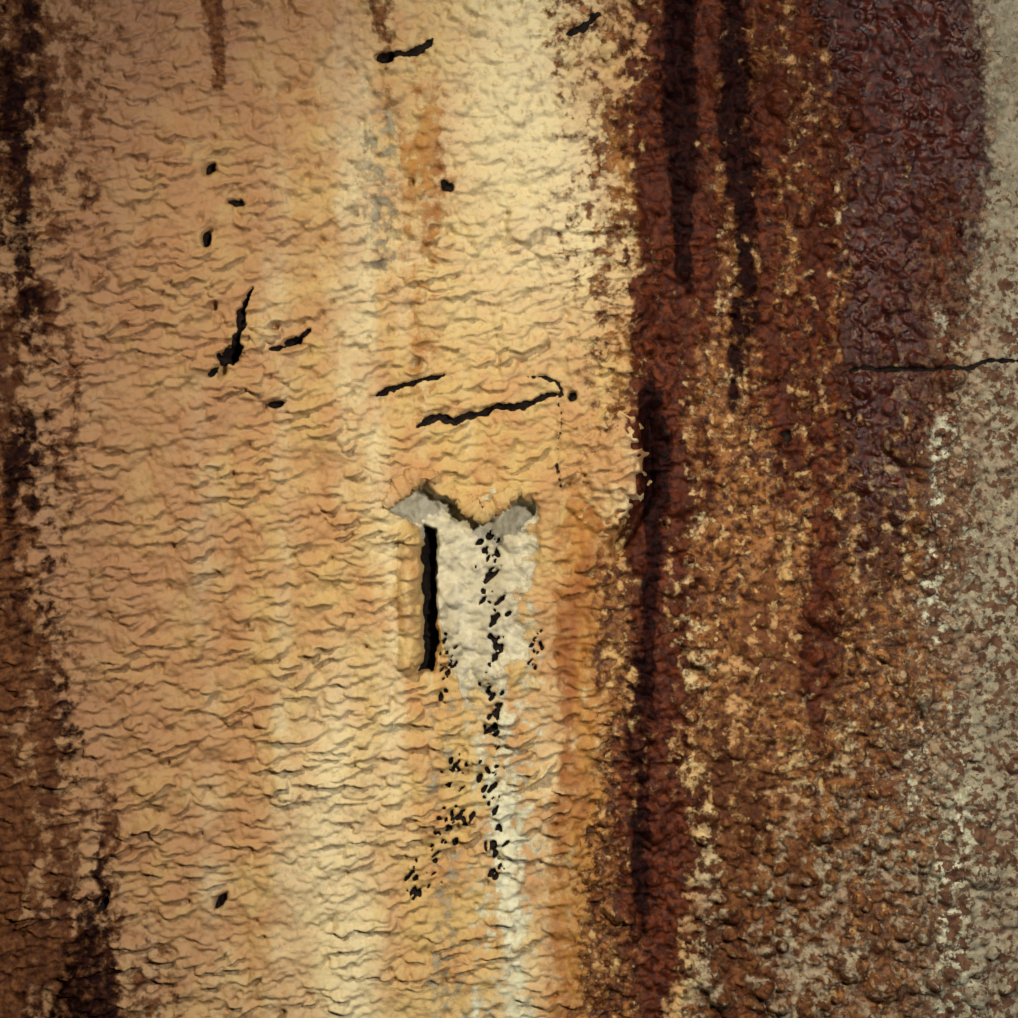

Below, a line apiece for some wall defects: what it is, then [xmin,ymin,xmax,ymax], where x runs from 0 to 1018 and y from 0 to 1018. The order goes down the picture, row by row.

crack [208,287,254,377]
crack [269,328,311,351]
crack [842,358,1018,374]
crack [416,376,564,487]
rust [543,0,1011,1018]
spalling [383,466,540,708]